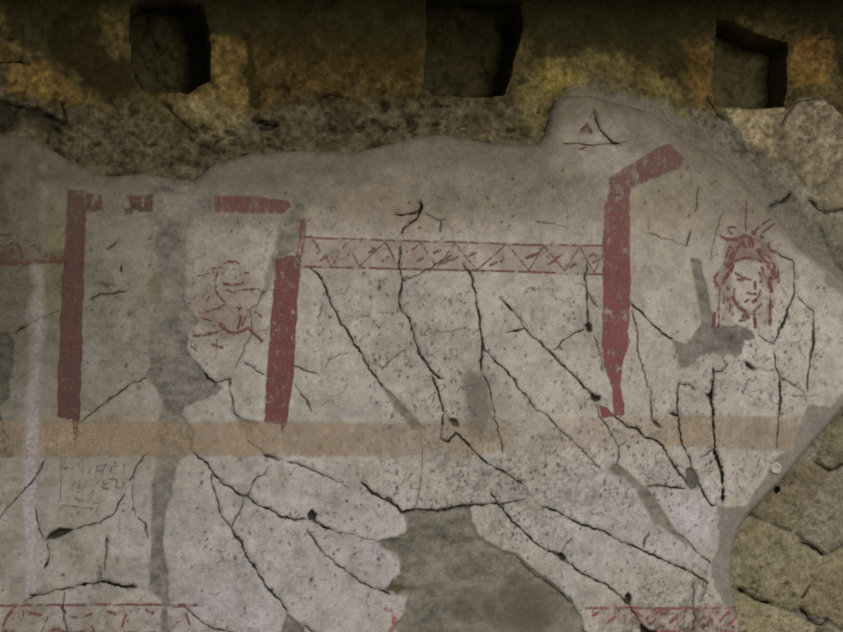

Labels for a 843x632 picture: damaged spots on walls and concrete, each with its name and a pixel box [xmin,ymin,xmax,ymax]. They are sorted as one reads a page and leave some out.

crack [770,193,842,213]
crack [91,266,127,299]
crack [81,377,146,422]
crack [193,201,725,625]
crack [762,254,815,448]
crack [0,461,49,568]
efflorescence [23,370,39,597]
crack [26,454,148,632]
crack [737,589,770,603]